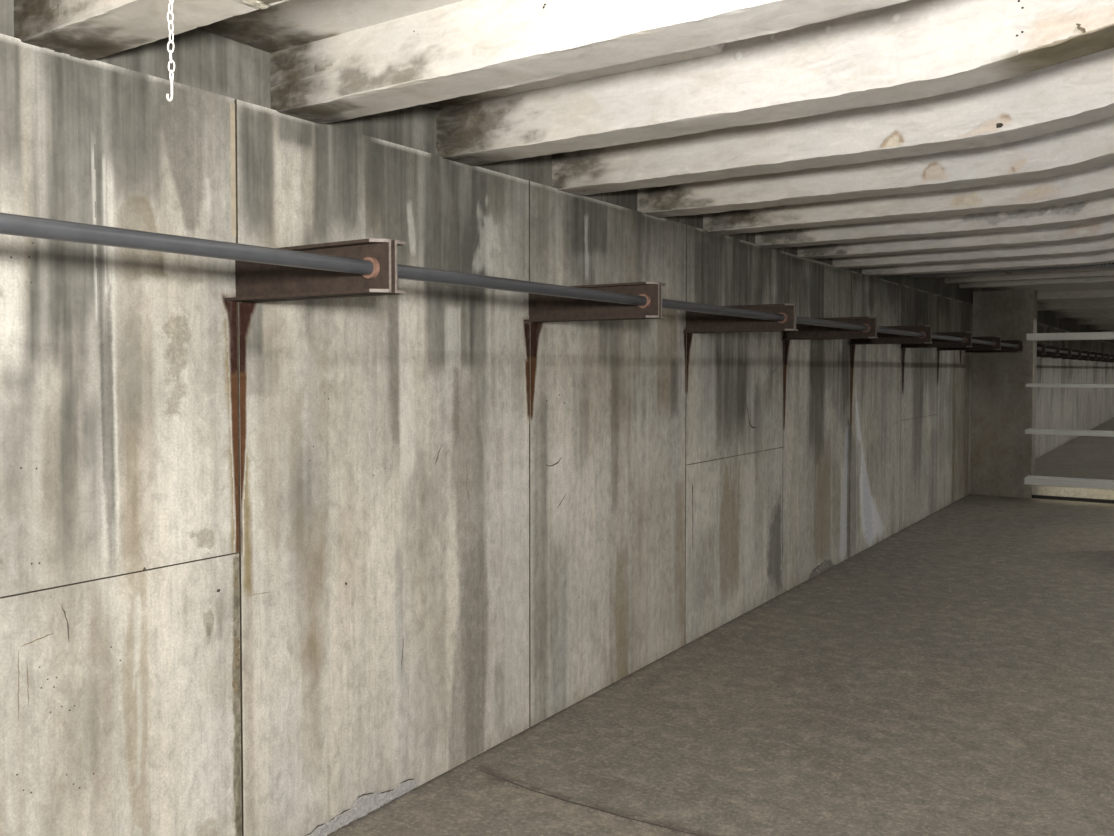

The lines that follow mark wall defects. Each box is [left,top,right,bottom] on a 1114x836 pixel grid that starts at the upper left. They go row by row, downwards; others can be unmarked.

water stain [14,0,160,61]
water stain [197,6,457,119]
water stain [154,77,214,235]
water stain [423,88,550,157]
flaking render [918,159,951,184]
peeling [948,155,1107,239]
rust [522,314,545,424]
rust [683,324,694,397]
rust [782,331,791,433]
rust [219,288,257,602]
spalling [303,777,420,836]
crack [476,763,729,836]